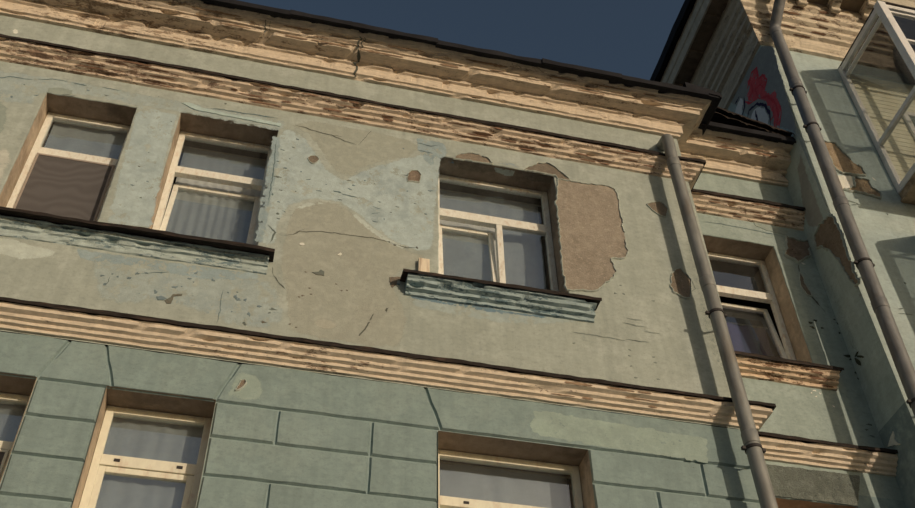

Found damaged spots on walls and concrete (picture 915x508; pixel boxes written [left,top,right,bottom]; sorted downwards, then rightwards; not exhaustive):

crack [353,36,366,77]
peeling [284,25,507,72]
flaking render [0,61,436,251]
peeling [447,122,556,151]
peeling [576,142,655,167]
spalling [824,140,882,200]
crack [290,229,418,249]
spalling [448,152,629,295]
spalling [710,155,861,297]
spalling [669,268,696,299]
spalling [227,372,262,401]